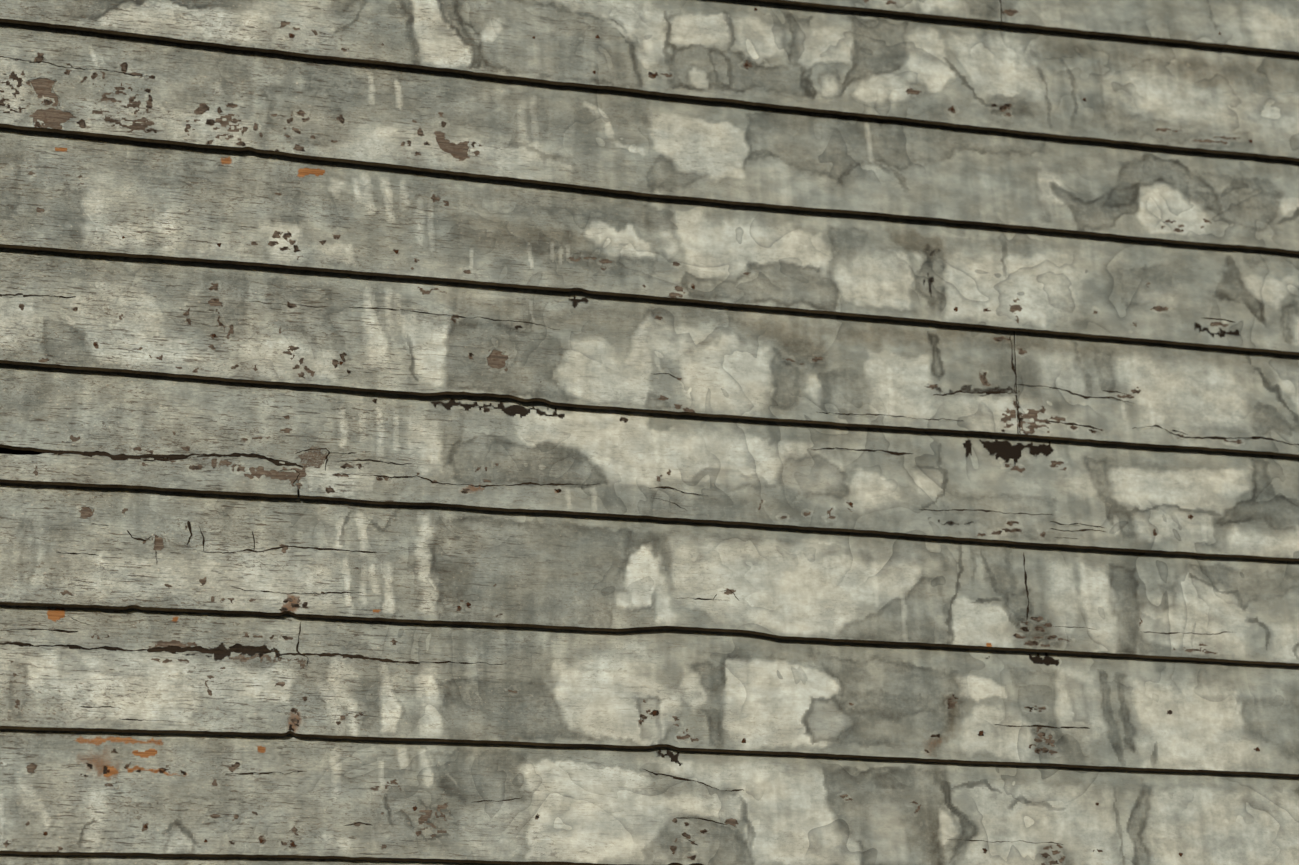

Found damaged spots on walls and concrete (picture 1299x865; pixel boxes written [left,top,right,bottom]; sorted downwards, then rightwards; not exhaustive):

peeling [0,60,161,136]
leakage [0,0,1299,239]
leakage [0,141,352,379]
crack [1045,385,1299,447]
crack [41,450,303,470]
leakage [0,492,401,617]
crack [234,532,377,557]
leakage [311,171,1299,865]
crack [0,587,507,670]
leakage [0,638,310,769]
peeling [21,761,42,778]
corrosion [74,736,189,791]